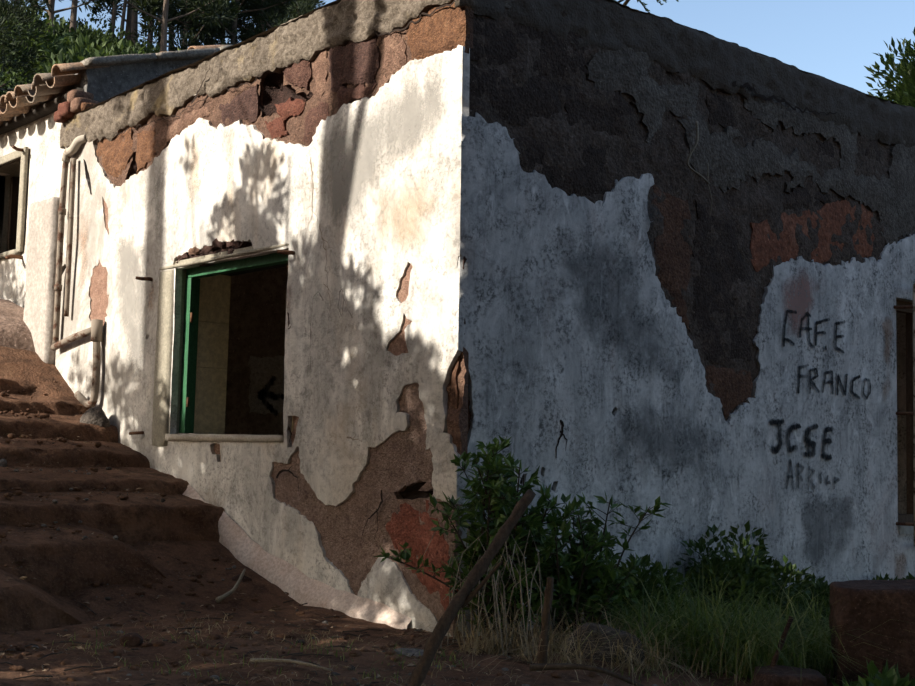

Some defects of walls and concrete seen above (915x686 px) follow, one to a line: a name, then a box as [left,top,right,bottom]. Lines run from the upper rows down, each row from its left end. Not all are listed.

peeling [89,260,109,326]
crack [303,157,336,365]
peeling [96,0,915,421]
spalling [271,383,463,621]
spalling [446,347,471,455]